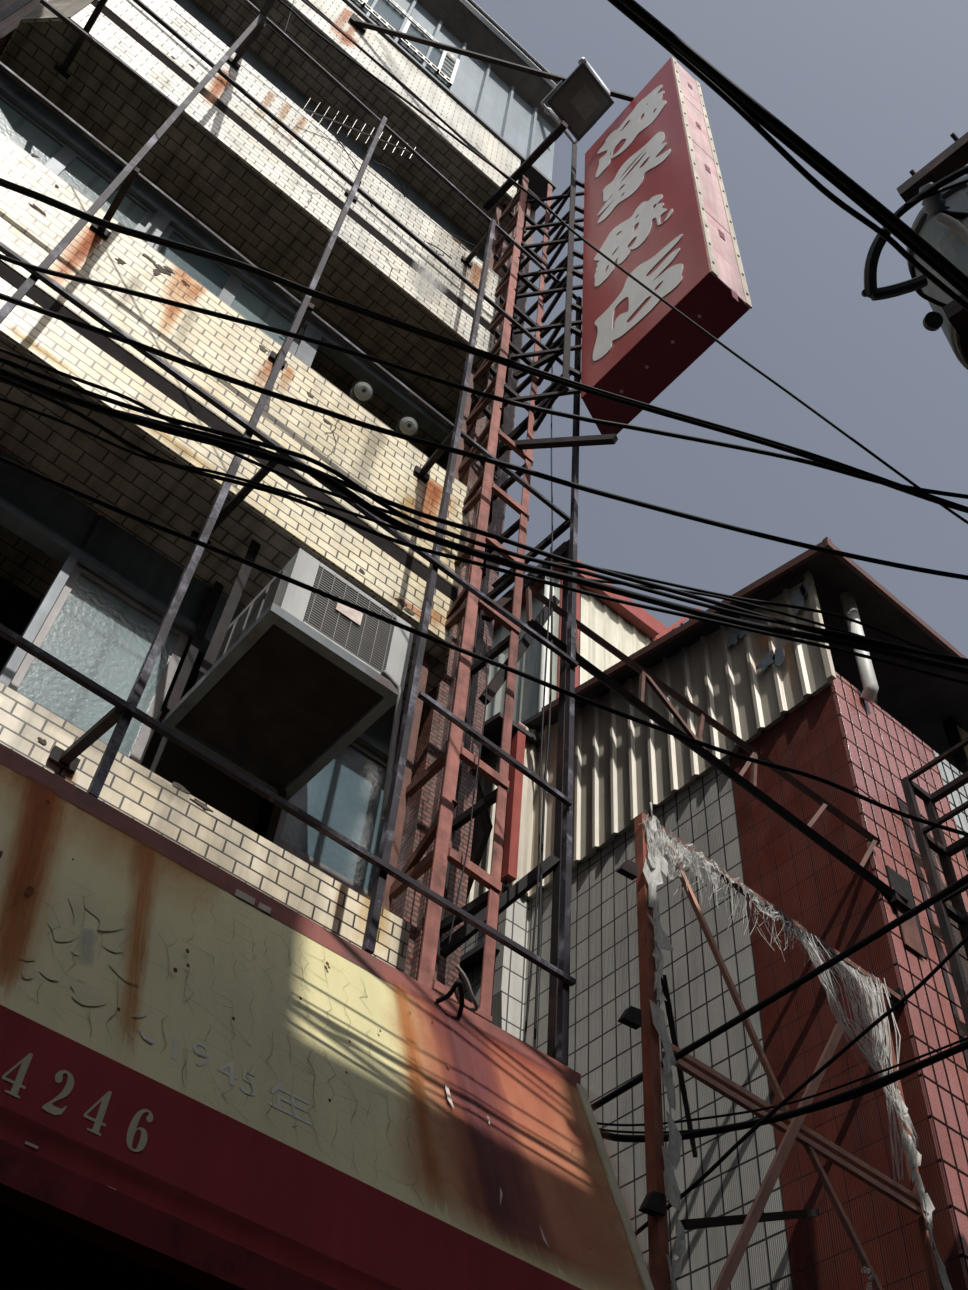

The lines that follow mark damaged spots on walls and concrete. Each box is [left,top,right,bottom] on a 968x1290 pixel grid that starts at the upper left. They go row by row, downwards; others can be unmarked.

corrosion [0,786,65,974]
corrosion [125,842,155,1030]
crack [14,881,424,1207]
corrosion [398,985,644,1288]